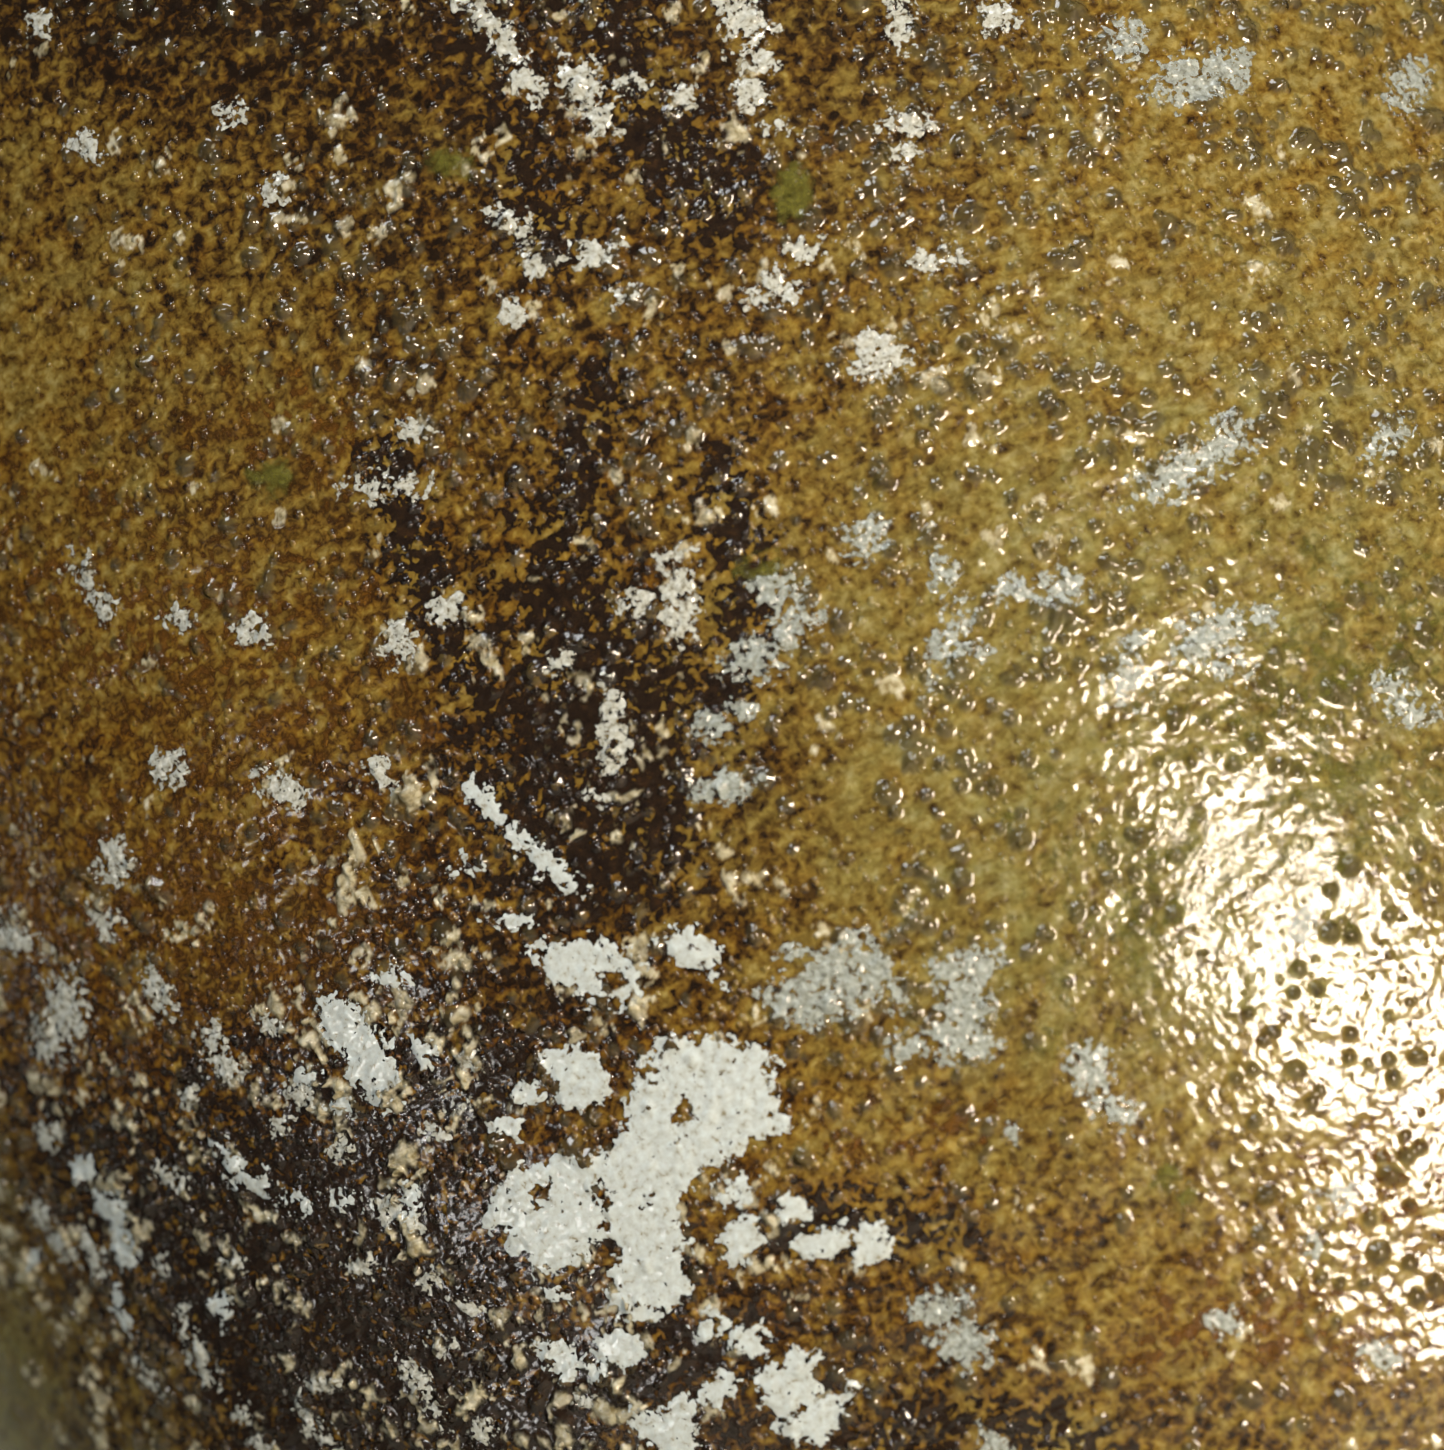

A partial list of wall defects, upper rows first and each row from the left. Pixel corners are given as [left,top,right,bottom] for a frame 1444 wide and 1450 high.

damp [170,0,795,301]
damp [876,0,913,32]
damp [346,340,794,956]
damp [1121,599,1439,987]
damp [16,1010,992,1450]
damp [828,1372,1140,1450]